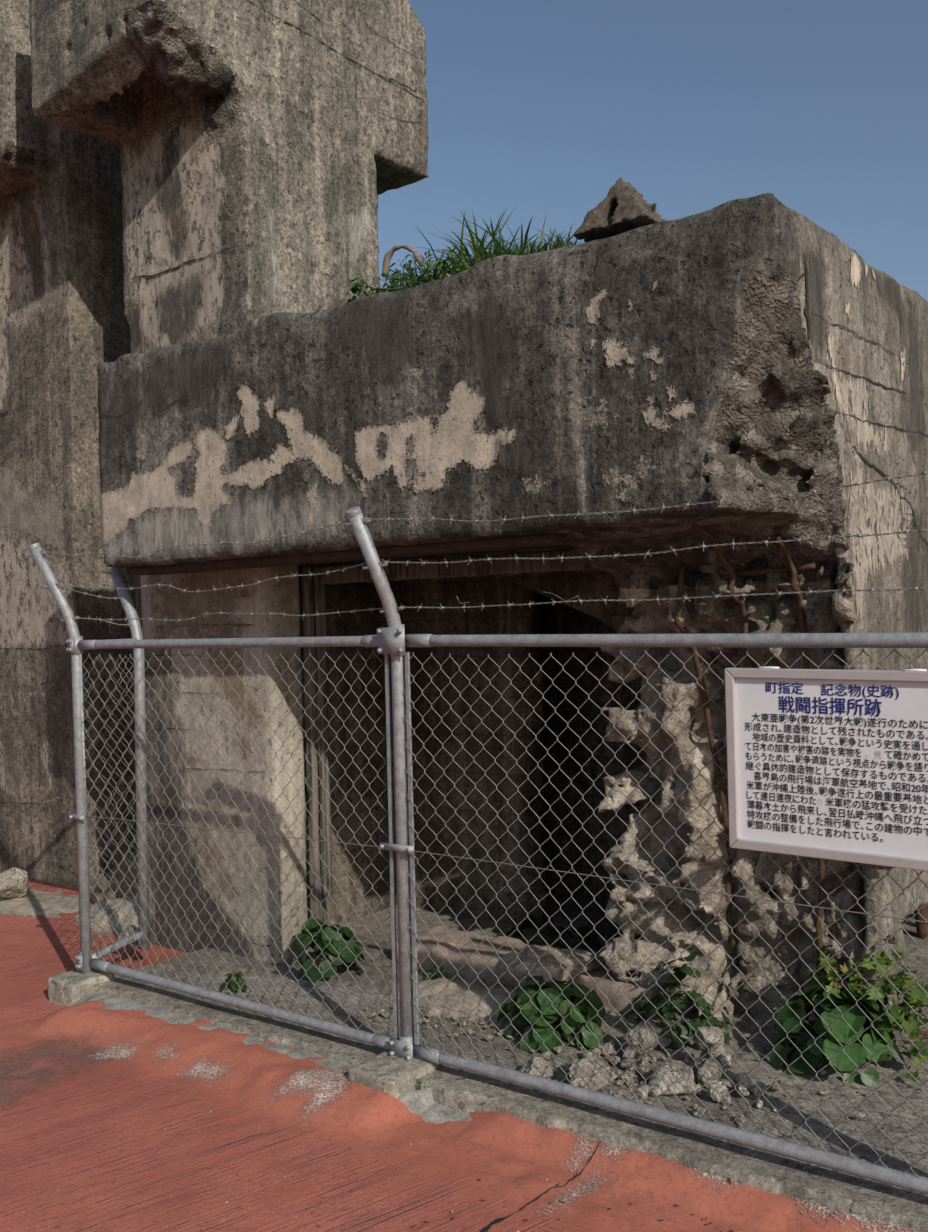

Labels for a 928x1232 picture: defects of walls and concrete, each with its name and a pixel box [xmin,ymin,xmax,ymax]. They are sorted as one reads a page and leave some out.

spalling [0,140,63,186]
peeling [122,0,242,354]
crack [133,229,242,340]
peeling [100,380,517,545]
crack [798,251,928,559]
spalling [550,274,899,1042]
crack [517,1141,601,1212]